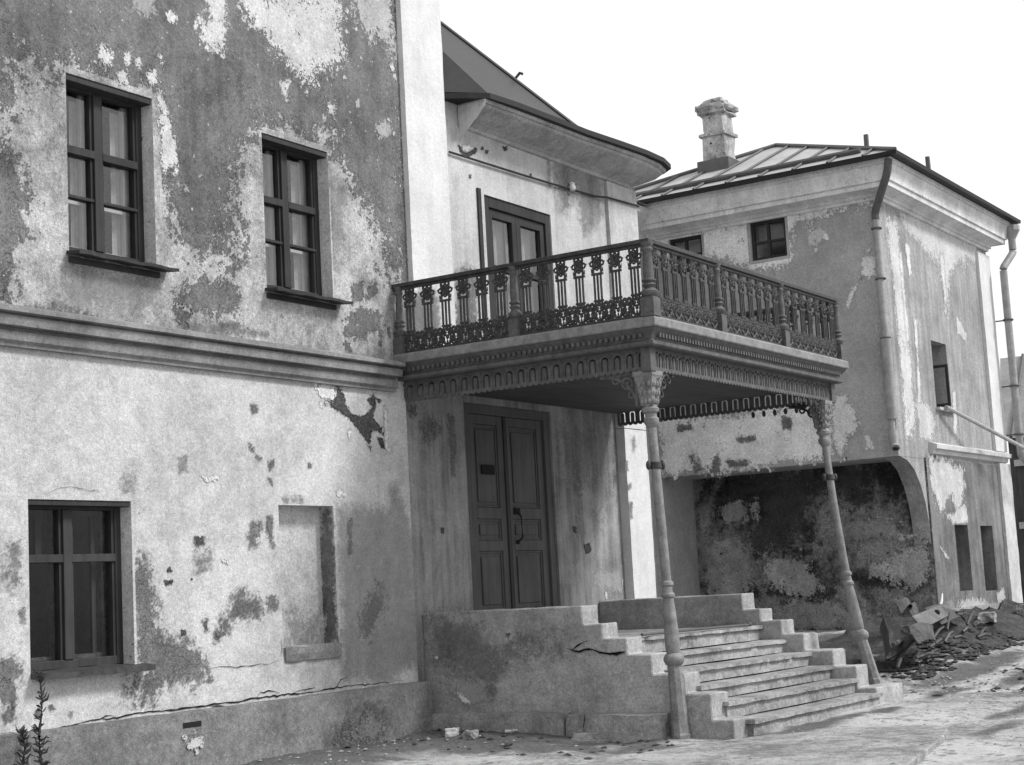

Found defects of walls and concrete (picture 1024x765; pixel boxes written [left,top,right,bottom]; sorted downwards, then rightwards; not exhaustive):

peeling [132,0,179,25]
peeling [193,0,399,122]
peeling [94,42,180,176]
peeling [372,118,395,140]
peeling [656,200,884,275]
peeling [846,248,877,310]
damp [884,209,977,445]
flaking render [314,383,391,454]
peeling [657,392,875,482]
peeling [926,453,968,525]
crack [567,641,625,656]
crack [61,676,403,727]